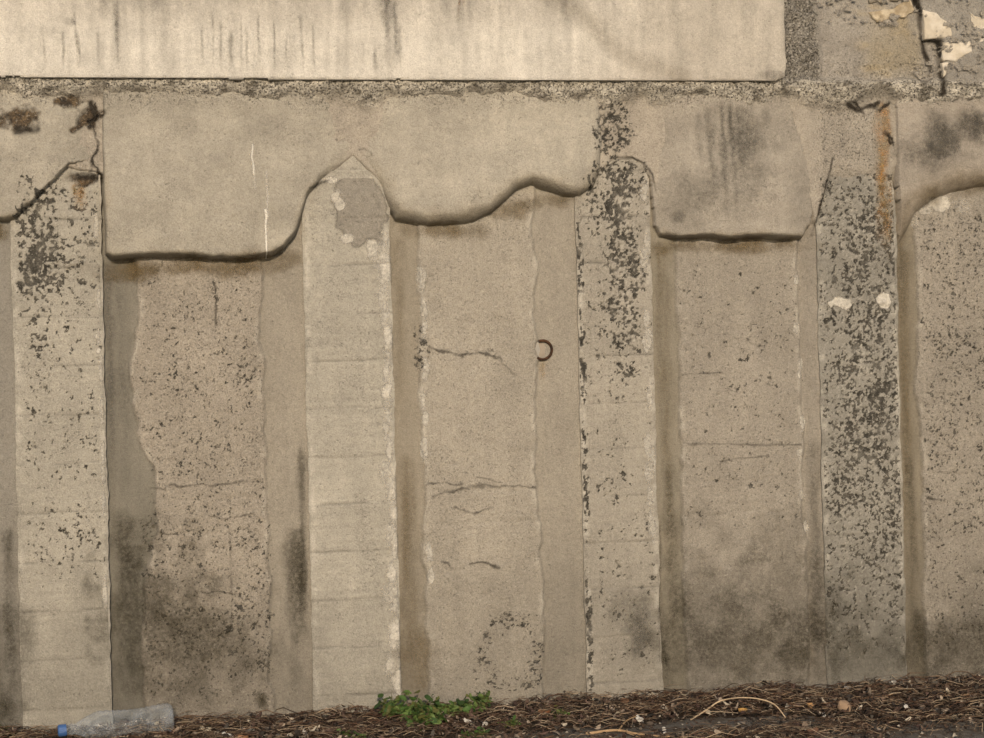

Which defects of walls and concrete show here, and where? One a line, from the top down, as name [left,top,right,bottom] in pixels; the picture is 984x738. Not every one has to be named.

crack [912,0,946,95]
crack [91,103,101,176]